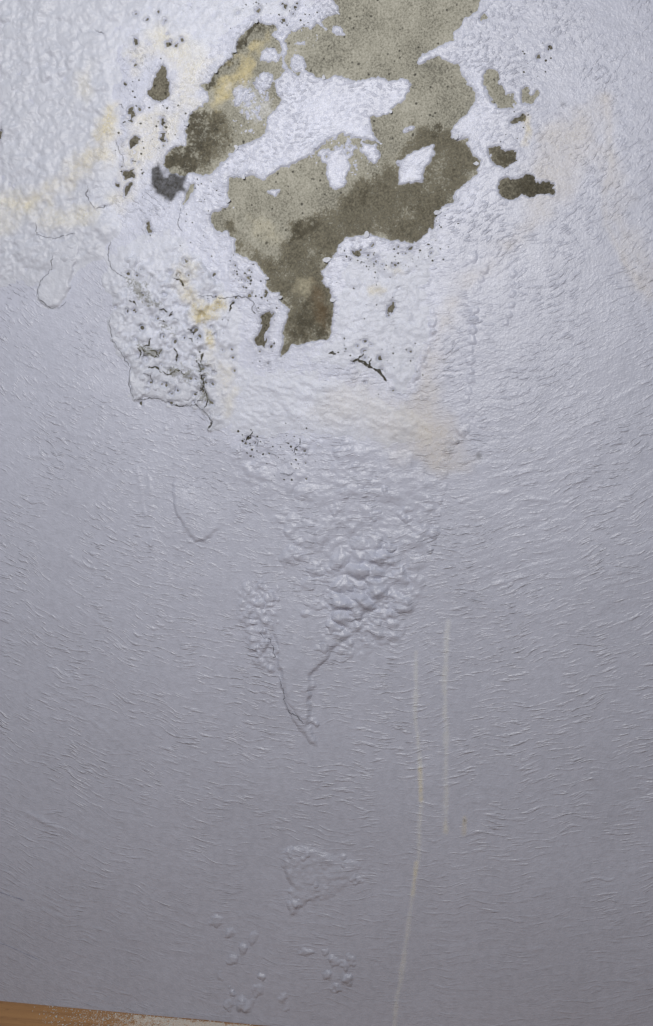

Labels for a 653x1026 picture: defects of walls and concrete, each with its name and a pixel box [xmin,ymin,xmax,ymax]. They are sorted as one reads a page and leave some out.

peeling [101,0,555,481]